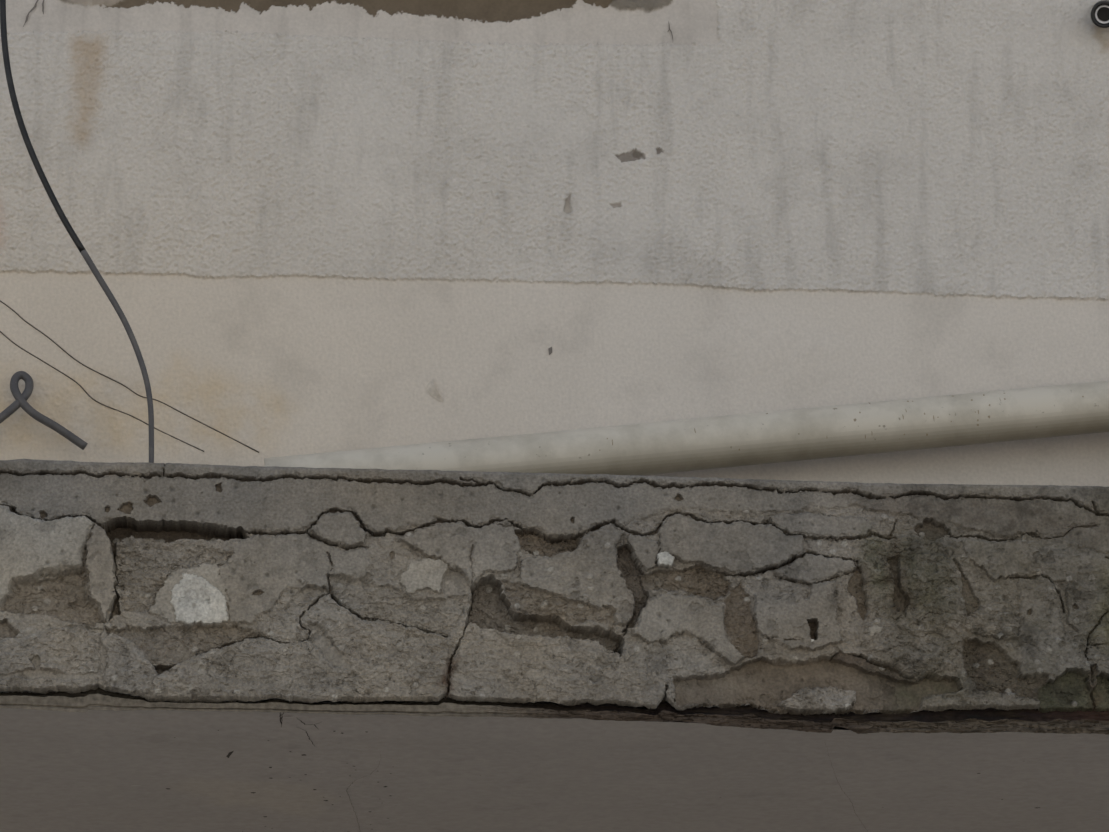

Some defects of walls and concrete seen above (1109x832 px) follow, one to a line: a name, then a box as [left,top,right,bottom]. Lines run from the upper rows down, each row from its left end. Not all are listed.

peeling [0,517,263,675]
crack [0,464,1109,711]
spalling [400,512,1109,715]
crack [280,708,423,746]